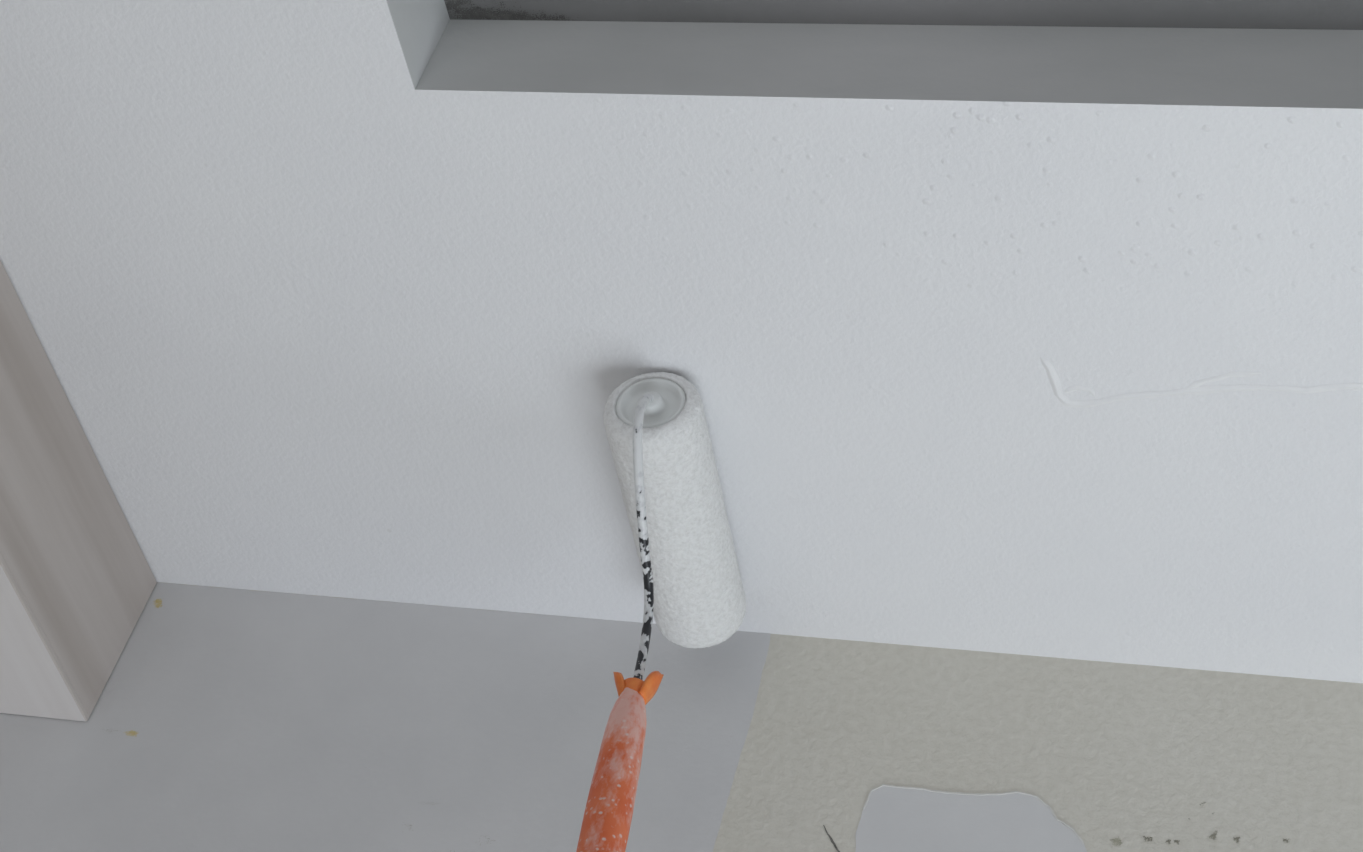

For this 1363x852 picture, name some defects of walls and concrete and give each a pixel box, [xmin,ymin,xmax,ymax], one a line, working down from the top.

leakage [445,0,578,20]
peeling [855,784,1087,852]